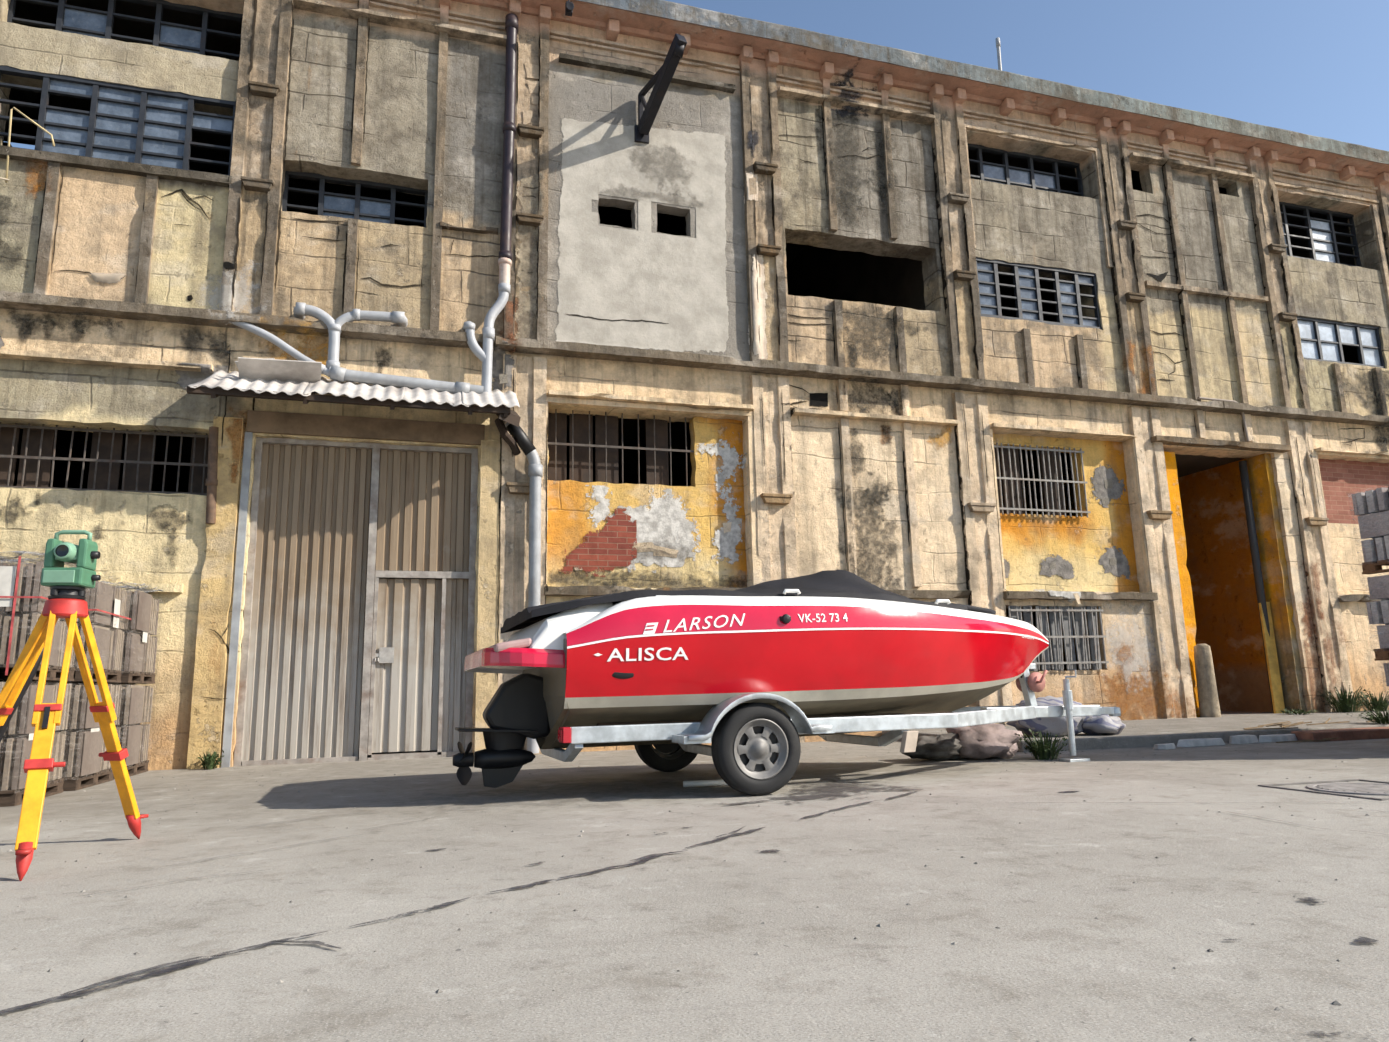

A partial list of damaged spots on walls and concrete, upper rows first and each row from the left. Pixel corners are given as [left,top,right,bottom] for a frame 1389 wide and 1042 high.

damp [816,58,896,225]
damp [0,195,11,224]
damp [0,241,23,268]
mould [827,307,928,443]
peeling [559,439,746,577]
mould [835,429,901,590]
spalling [1091,463,1126,508]
spalling [1034,554,1081,604]
spalling [1099,546,1131,579]
crack [800,800,876,819]
crack [0,827,765,1013]